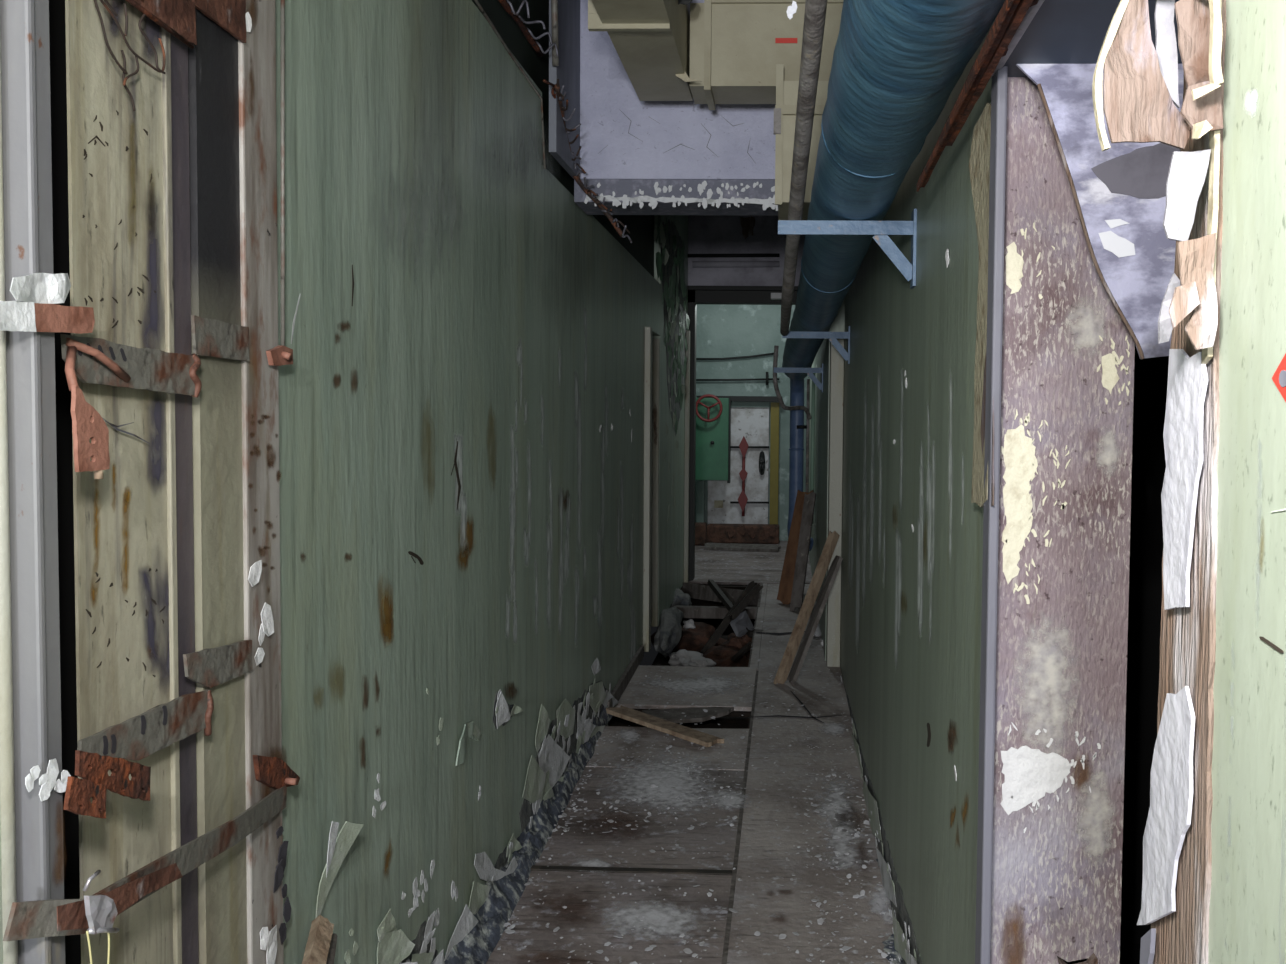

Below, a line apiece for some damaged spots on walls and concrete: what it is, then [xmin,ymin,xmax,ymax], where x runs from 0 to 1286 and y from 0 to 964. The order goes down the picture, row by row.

peeling [584,181,778,435]
peeling [1005,223,1055,294]
peeling [1069,306,1130,405]
peeling [1099,431,1118,471]
rust [459,520,473,567]
peeling [1001,409,1071,604]
rust [380,592,393,641]
peeling [1000,630,1112,856]
peeling [377,658,618,964]